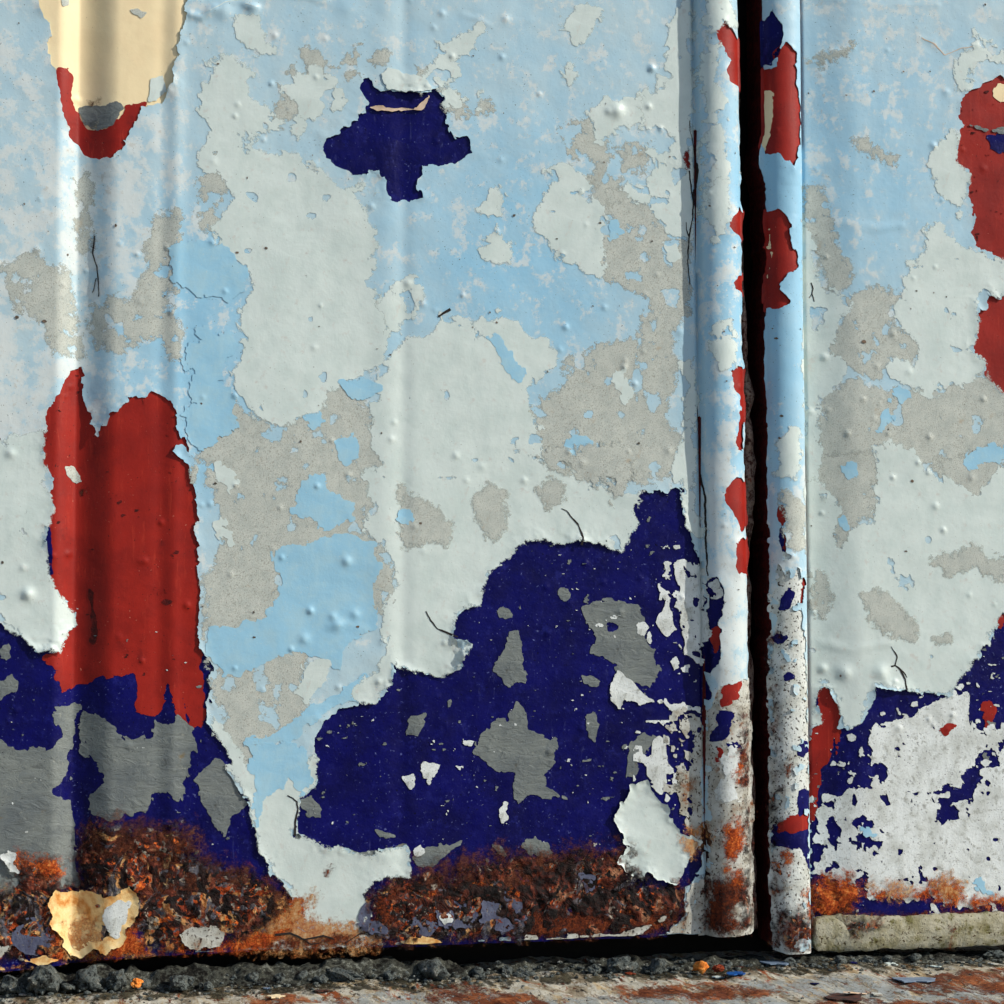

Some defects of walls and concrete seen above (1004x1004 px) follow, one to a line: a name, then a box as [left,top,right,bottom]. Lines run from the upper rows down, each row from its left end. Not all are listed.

peeling [39,0,187,160]
peeling [285,39,496,202]
peeling [758,11,857,165]
peeling [956,75,1004,260]
peeling [761,184,1004,548]
peeling [0,117,755,948]
corrosion [739,712,752,787]
peeling [766,488,1004,955]
corrosion [0,809,689,970]
corrosion [679,822,716,862]
corrosion [699,800,757,935]
corrosion [766,785,1004,948]